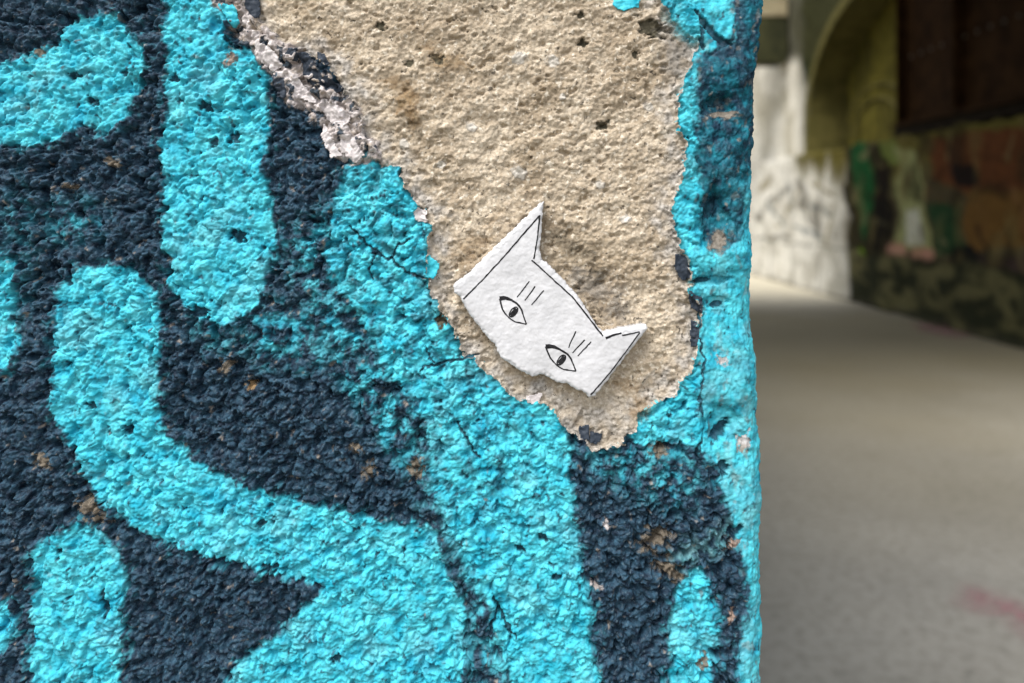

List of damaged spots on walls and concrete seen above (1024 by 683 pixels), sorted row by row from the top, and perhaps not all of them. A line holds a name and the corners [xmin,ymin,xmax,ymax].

crack [349,225,424,280]
flaking render [210,0,703,452]
peeling [648,441,668,459]
crack [696,312,707,458]